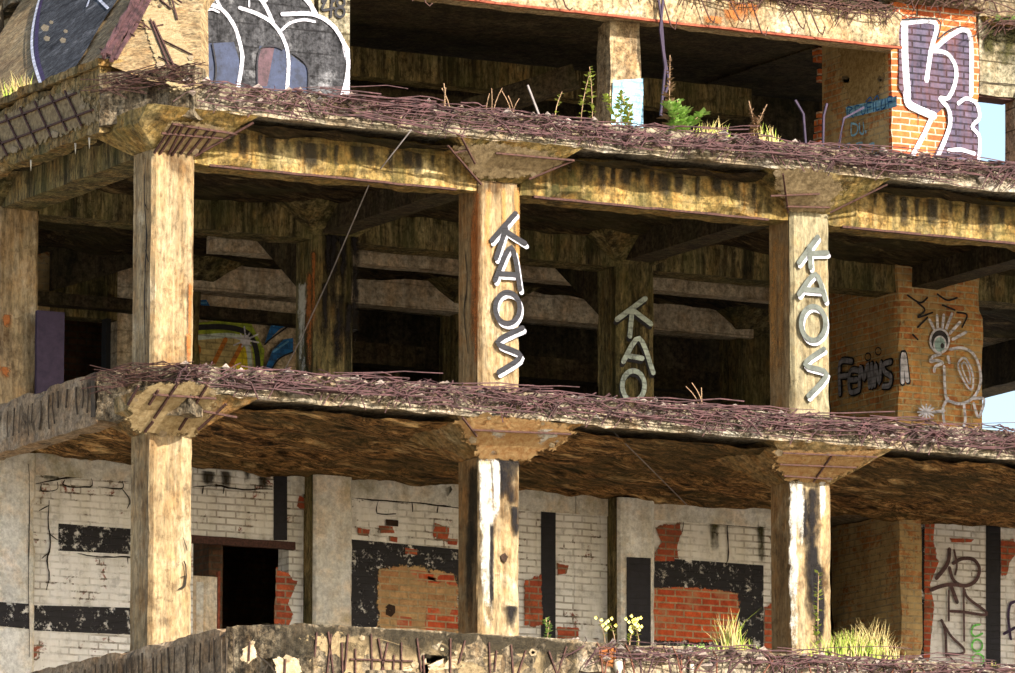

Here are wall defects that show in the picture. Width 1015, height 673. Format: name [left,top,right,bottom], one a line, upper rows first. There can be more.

water stain [225,133,339,165]
water stain [351,146,374,164]
water stain [388,150,435,173]
water stain [874,193,952,224]
water stain [965,203,1005,227]
water stain [203,471,231,488]
water stain [466,451,519,606]
water stain [789,481,826,646]
spalling [273,519,1015,673]
water stain [283,606,582,673]